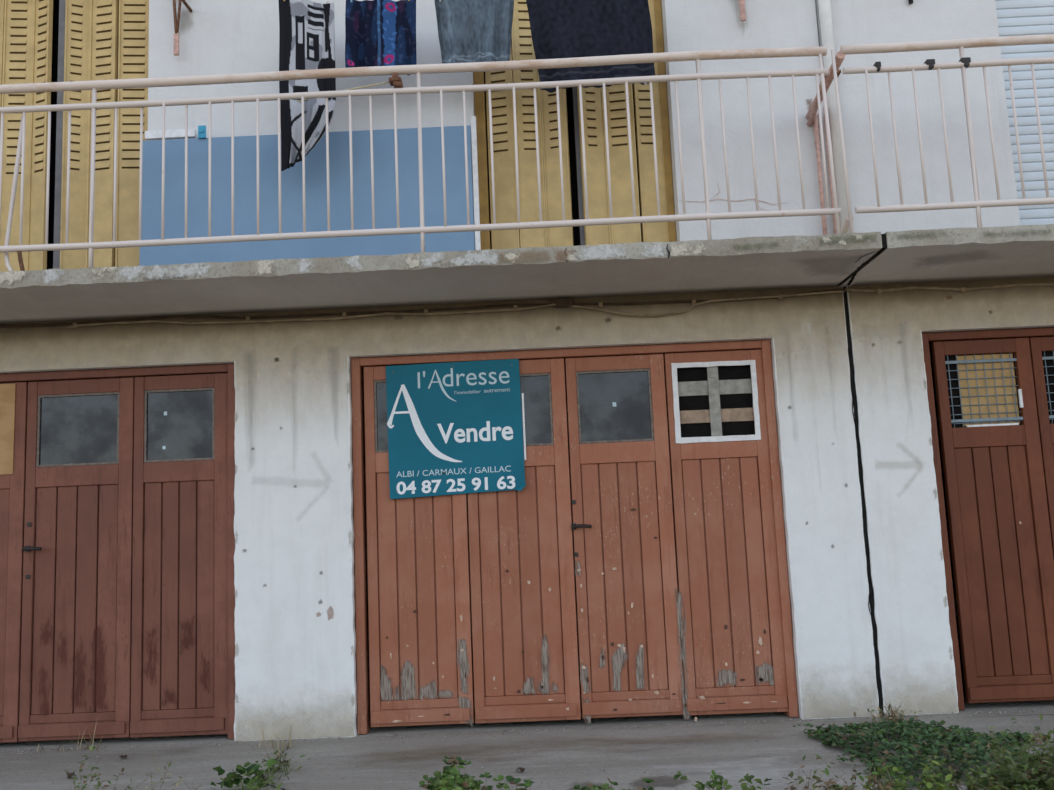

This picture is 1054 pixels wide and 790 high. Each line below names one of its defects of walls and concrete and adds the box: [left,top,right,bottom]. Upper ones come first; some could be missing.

crack [688,182,778,211]
peeling [380,638,473,726]
peeling [517,634,558,701]
peeling [580,642,659,723]
peeling [672,589,726,722]
peeling [717,629,774,687]